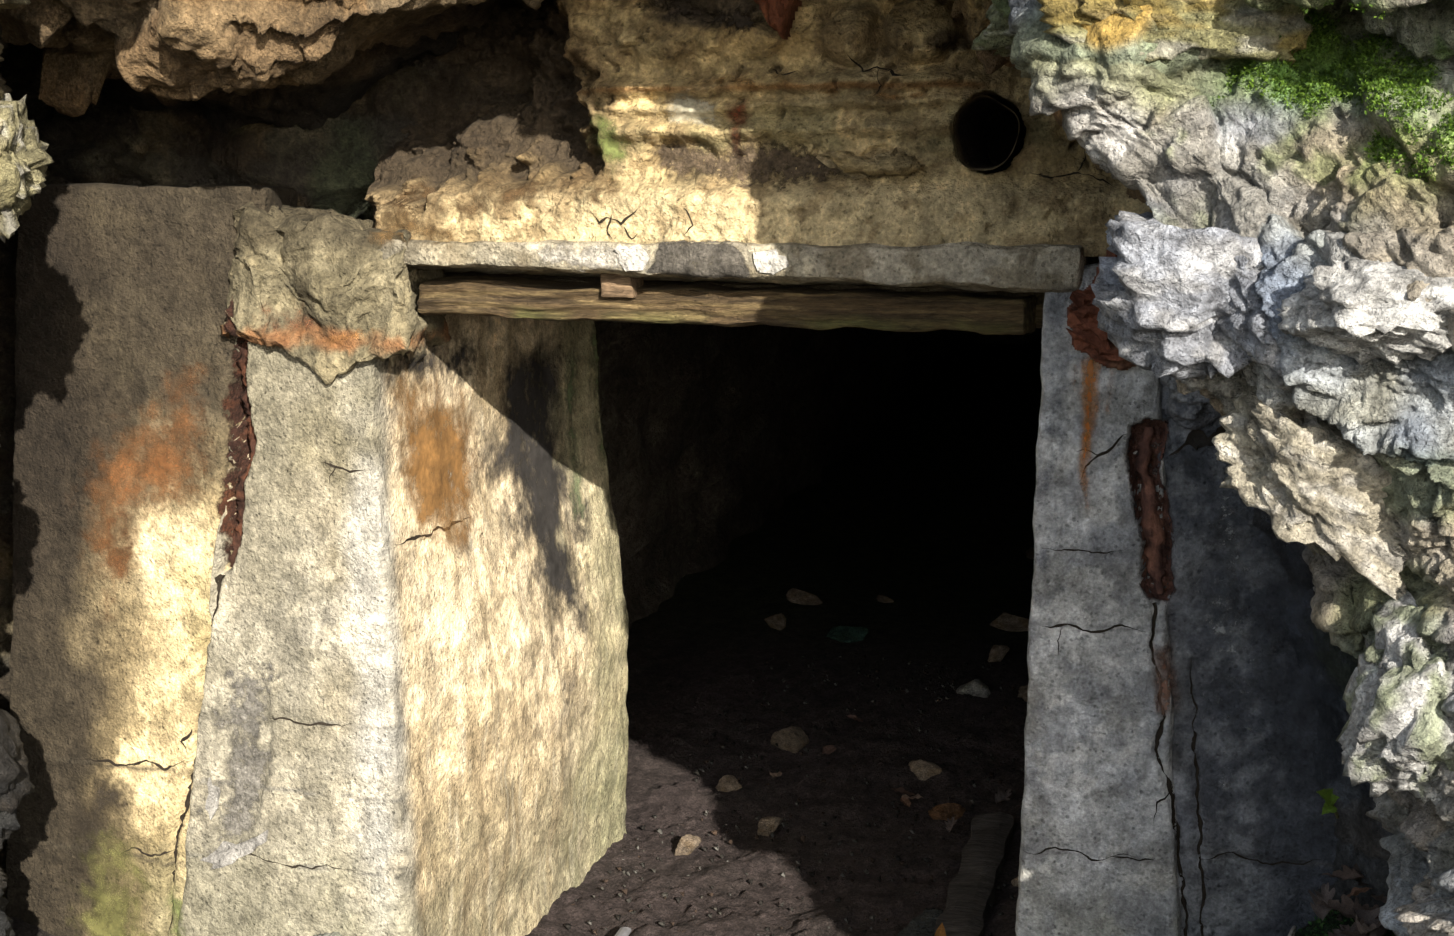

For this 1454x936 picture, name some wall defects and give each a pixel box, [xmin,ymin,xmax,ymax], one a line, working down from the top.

water stain [384,339,478,385]
rust [1066,289,1125,486]
water stain [485,343,588,630]
crack [211,571,227,627]
crack [72,713,200,930]
crack [269,717,354,726]
crack [1023,602,1321,936]